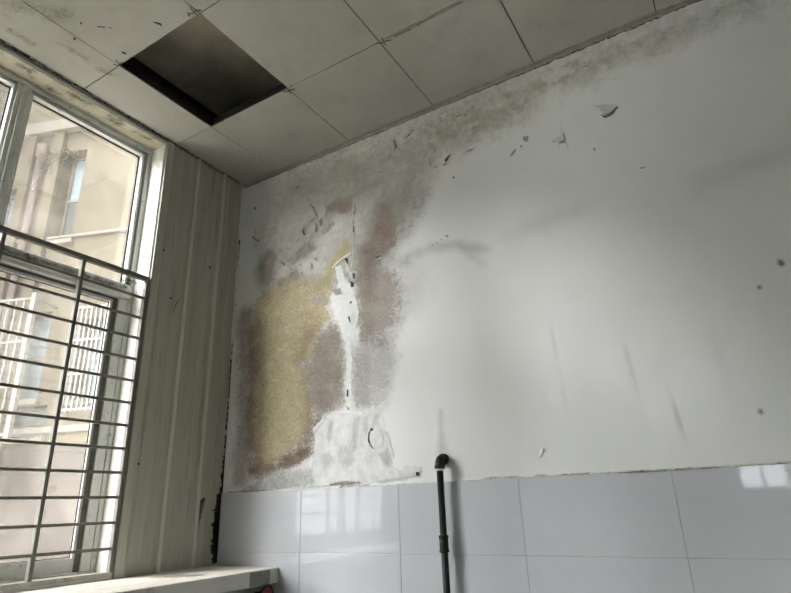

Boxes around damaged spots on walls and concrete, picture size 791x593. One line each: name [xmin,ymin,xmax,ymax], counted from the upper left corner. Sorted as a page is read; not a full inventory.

peeling [593,104,618,118]
peeling [311,252,407,487]